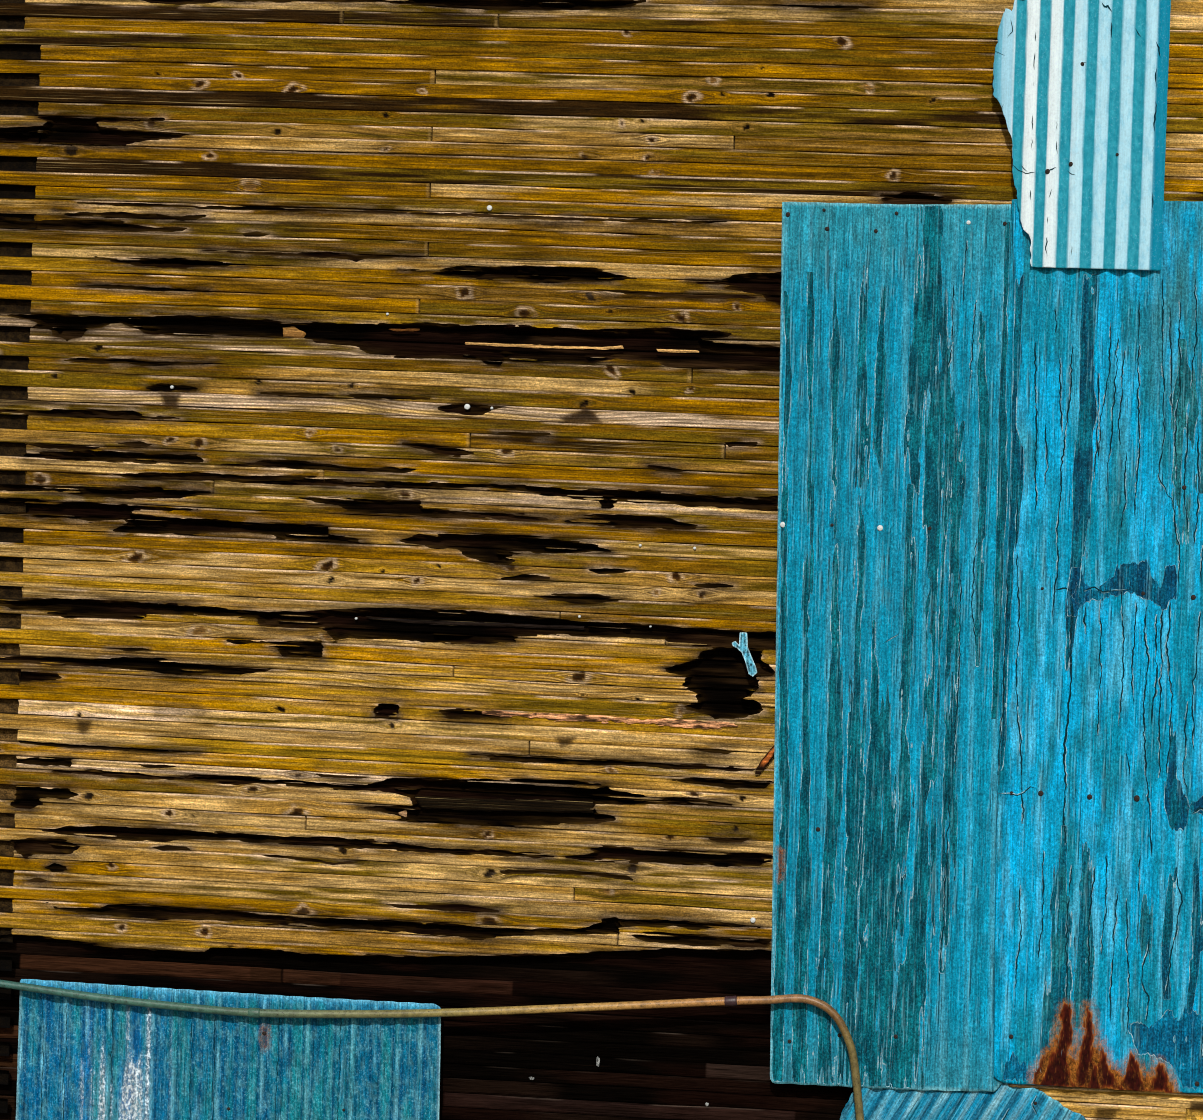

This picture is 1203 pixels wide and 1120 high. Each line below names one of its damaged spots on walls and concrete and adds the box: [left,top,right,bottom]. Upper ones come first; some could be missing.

crack [948,241,977,383]
peeling [1065,274,1178,671]
crack [938,539,977,982]
crack [998,279,1203,1033]
peeling [1164,721,1203,831]
peeling [1003,825,1095,1082]
rust [1032,1002,1176,1093]
peeling [1128,858,1203,1091]